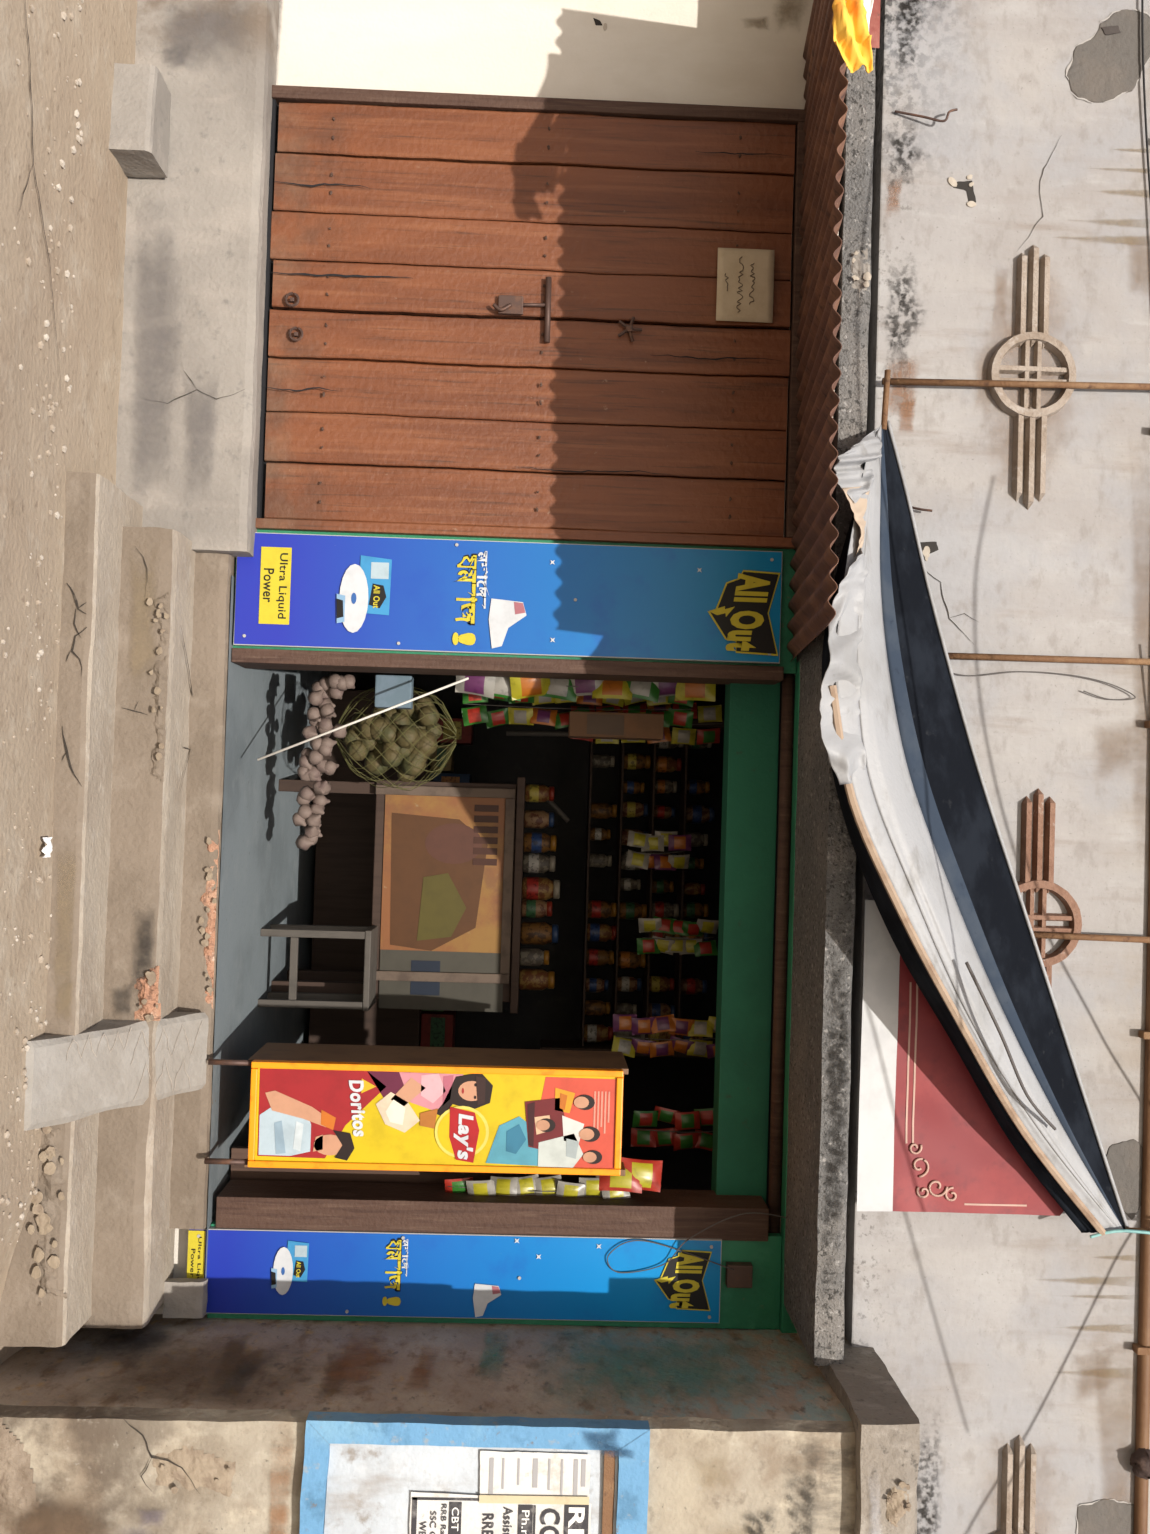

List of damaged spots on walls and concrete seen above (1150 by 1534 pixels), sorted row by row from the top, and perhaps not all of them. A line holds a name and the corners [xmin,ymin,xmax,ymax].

leakage [899,0,919,62]
leakage [889,278,918,356]
leakage [917,1446,936,1534]